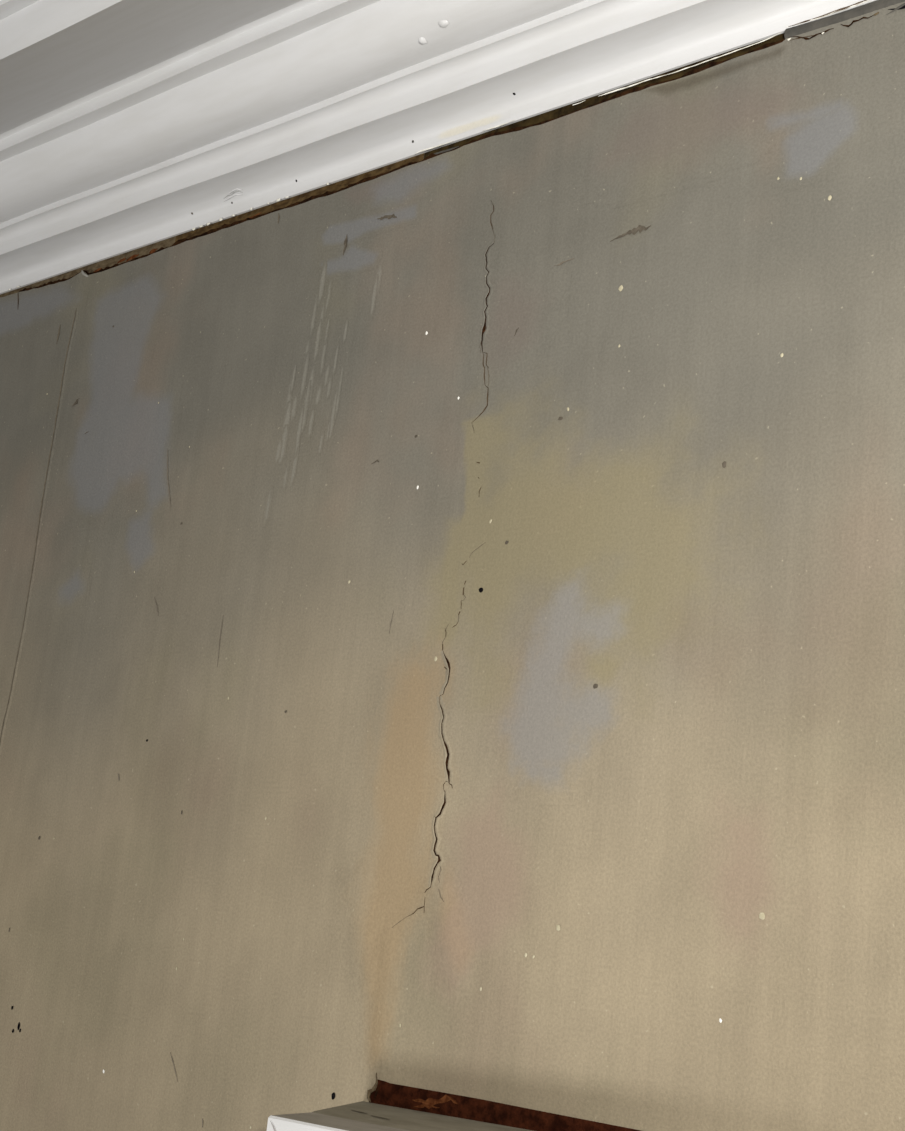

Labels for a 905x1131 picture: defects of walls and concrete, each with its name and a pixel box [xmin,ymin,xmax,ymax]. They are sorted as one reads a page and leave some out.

crack [472,201,495,429]
crack [393,544,483,927]